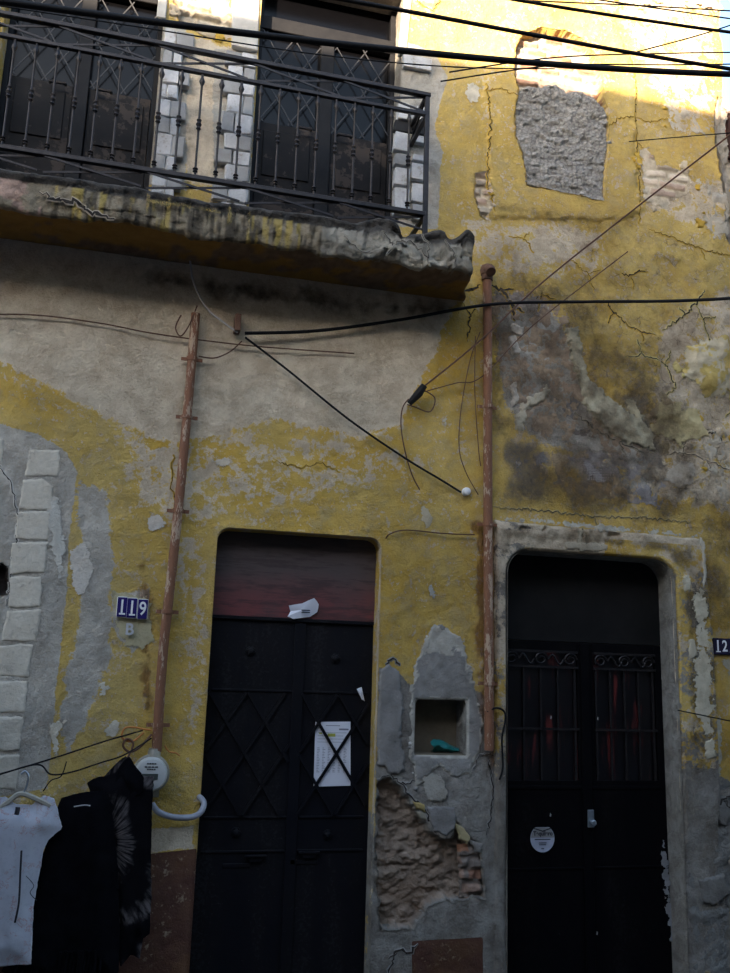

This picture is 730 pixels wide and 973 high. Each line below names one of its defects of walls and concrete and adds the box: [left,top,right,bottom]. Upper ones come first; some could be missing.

spalling [474,171,496,220]
crack [484,83,519,212]
crack [509,232,534,253]
spalling [631,65,730,244]
spalling [492,290,730,502]
peeling [47,496,94,595]
rust [472,521,495,676]
peeling [505,517,730,776]
peeling [44,719,68,756]
peeling [104,720,120,737]
spalling [373,664,487,931]
crack [386,943,418,973]